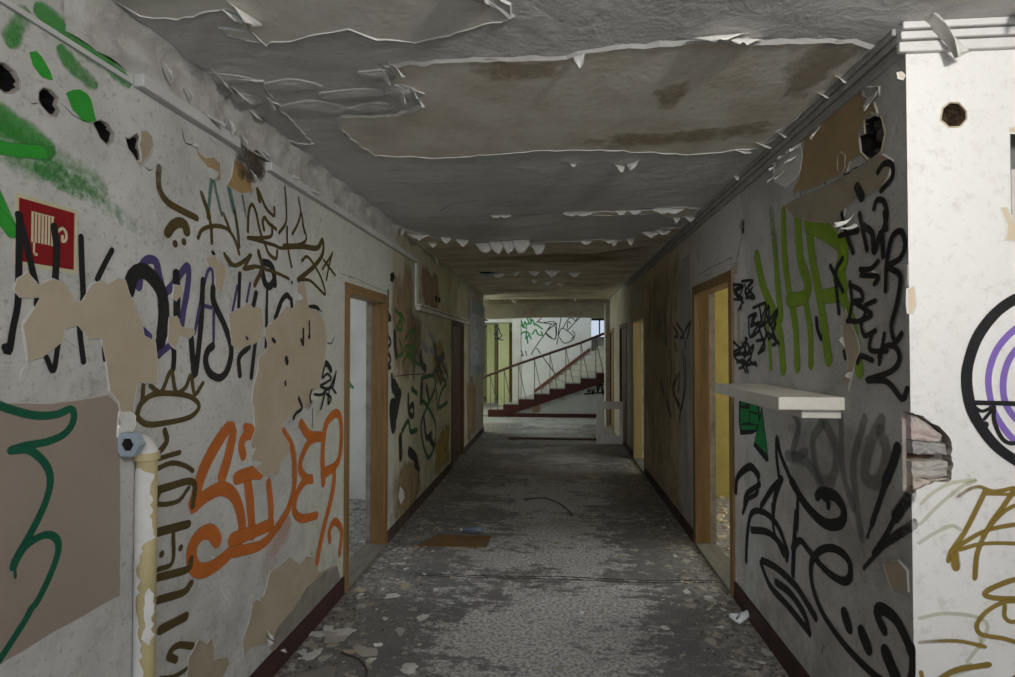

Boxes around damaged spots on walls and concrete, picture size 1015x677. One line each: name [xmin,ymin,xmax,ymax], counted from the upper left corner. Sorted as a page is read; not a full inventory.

flaking render [64,0,701,303]
peeling [338,33,894,234]
peeling [11,271,195,438]
peeling [227,281,327,478]
spalling [906,414,948,489]
peeling [186,637,230,677]
peeling [241,550,381,665]